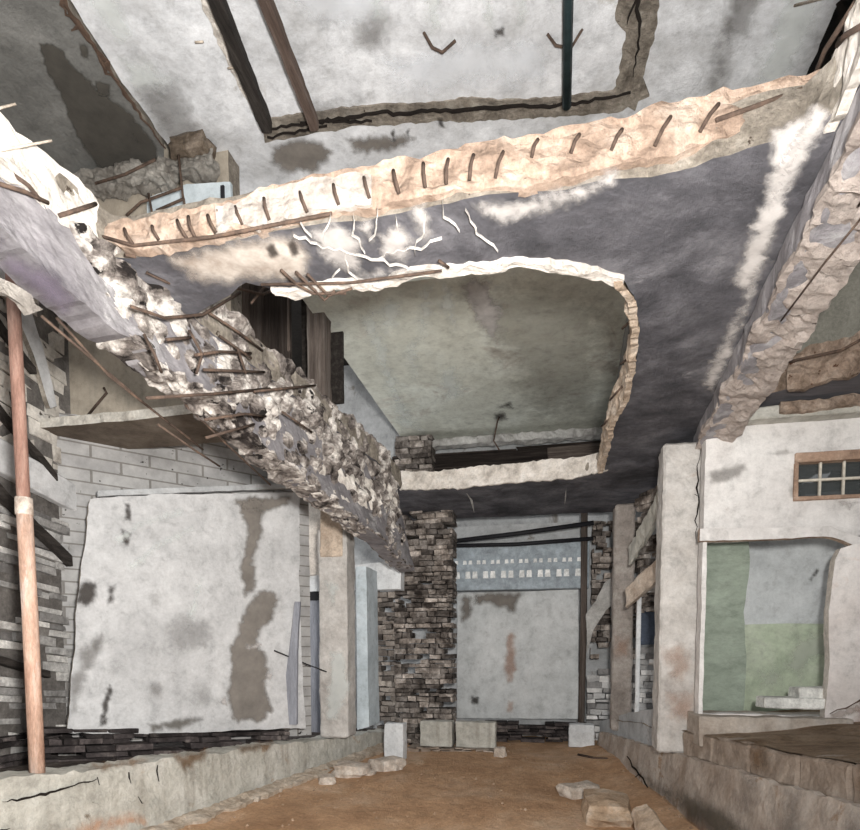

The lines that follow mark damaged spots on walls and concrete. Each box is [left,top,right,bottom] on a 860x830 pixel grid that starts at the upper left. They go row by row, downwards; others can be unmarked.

crack [267,0,642,140]
water stain [273,141,330,172]
water stain [350,137,407,153]
spalling [0,0,860,569]
water stain [228,496,290,722]
crack [7,777,100,804]